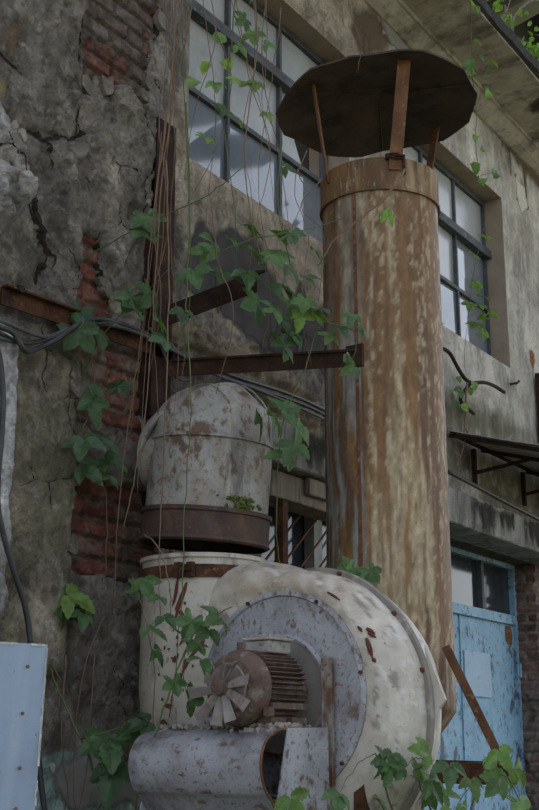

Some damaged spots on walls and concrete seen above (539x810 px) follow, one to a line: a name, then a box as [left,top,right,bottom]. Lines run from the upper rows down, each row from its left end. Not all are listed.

spalling [81,0,169,104]
crack [112,160,154,213]
damp [502,141,539,197]
crack [29,195,103,289]
spalling [68,336,148,442]
spalling [67,465,159,586]
damp [472,497,539,546]